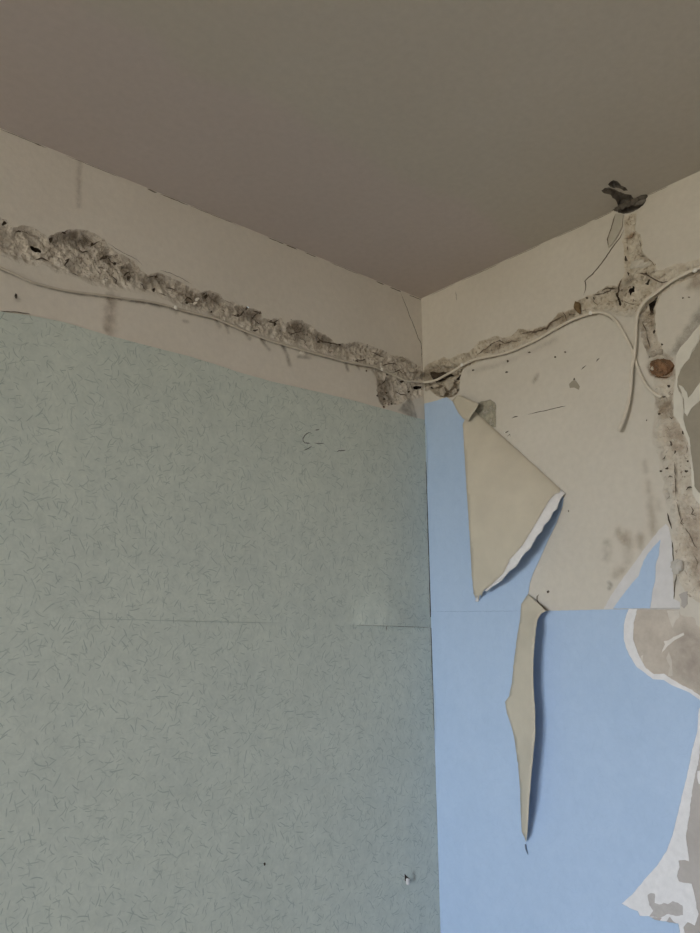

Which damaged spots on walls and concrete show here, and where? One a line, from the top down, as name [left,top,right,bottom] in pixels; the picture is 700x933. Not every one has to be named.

flaking render [0,180,700,608]